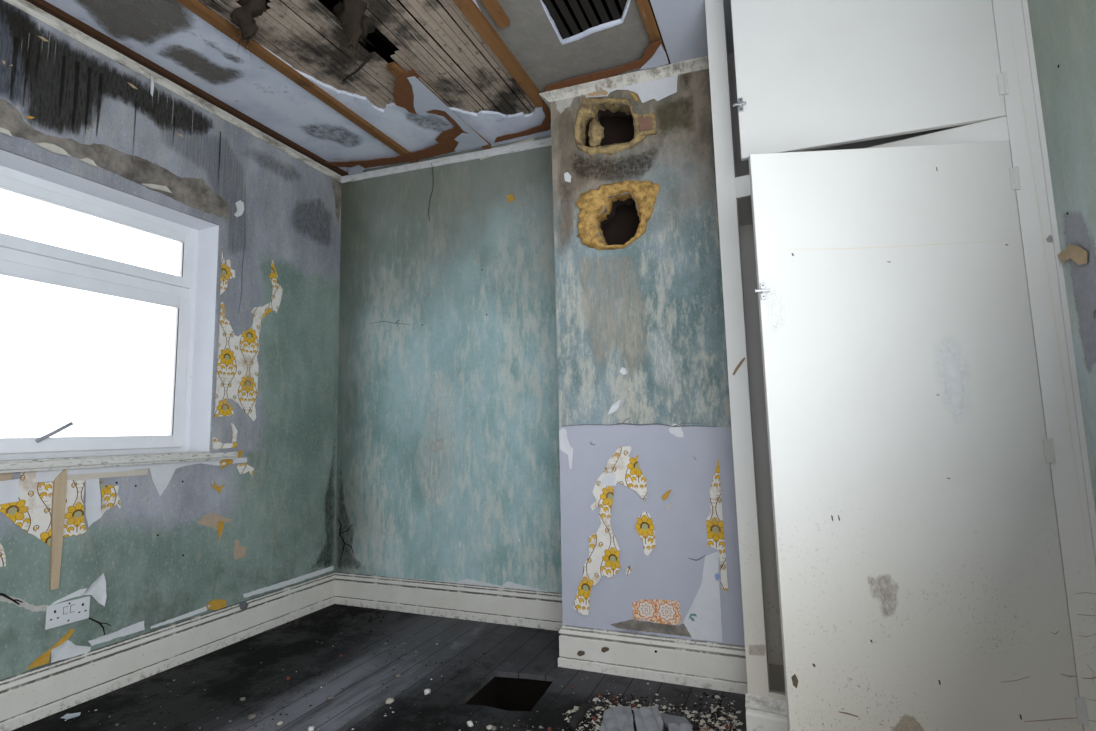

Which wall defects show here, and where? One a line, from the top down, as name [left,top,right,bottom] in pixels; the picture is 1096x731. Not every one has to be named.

leakage [1,0,242,237]
flaking render [0,99,244,219]
leakage [304,125,358,145]
spalling [555,97,657,156]
leakage [560,116,654,243]
spalling [575,180,660,250]
flaking render [1046,215,1096,368]
crack [337,518,354,556]
flaking render [559,400,745,646]
peeling [83,573,107,606]
crack [88,617,111,635]
peeling [26,605,210,670]